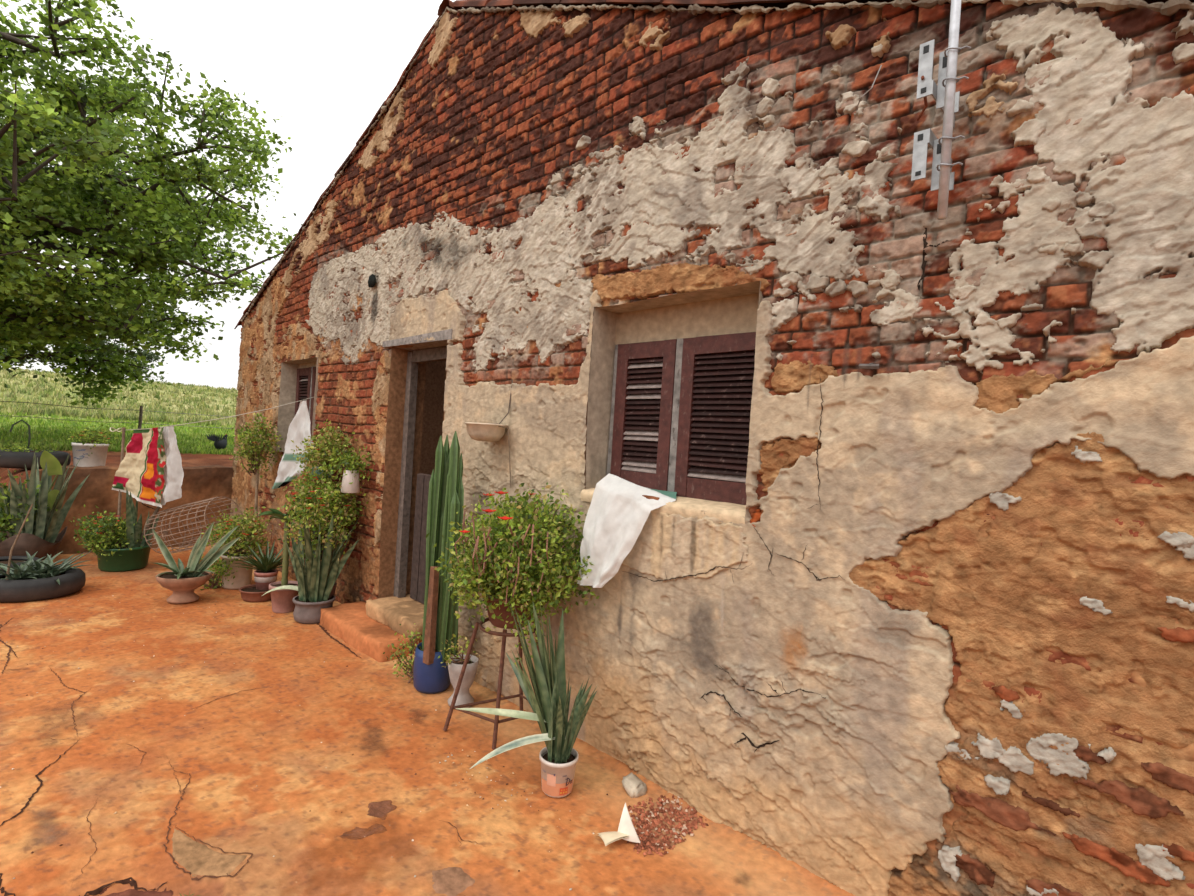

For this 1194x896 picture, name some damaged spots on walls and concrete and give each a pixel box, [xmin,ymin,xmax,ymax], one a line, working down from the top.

peeling [229,3,1194,553]
crack [0,618,18,674]
spalling [849,432,1194,896]
crack [0,873,15,896]
crack [0,668,89,826]
crack [71,744,253,896]